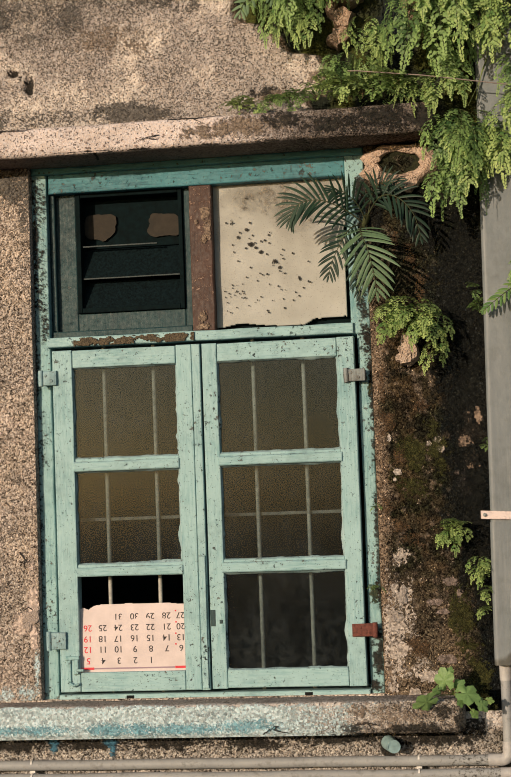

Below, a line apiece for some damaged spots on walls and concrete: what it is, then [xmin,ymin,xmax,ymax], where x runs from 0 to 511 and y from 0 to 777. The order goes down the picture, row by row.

spalling [325,0,364,52]
spalling [8,70,34,97]
leakage [179,85,433,141]
leakage [352,175,389,468]
leakage [394,181,494,651]
leakage [372,481,381,612]
leakage [370,628,385,693]
peeling [0,702,363,741]